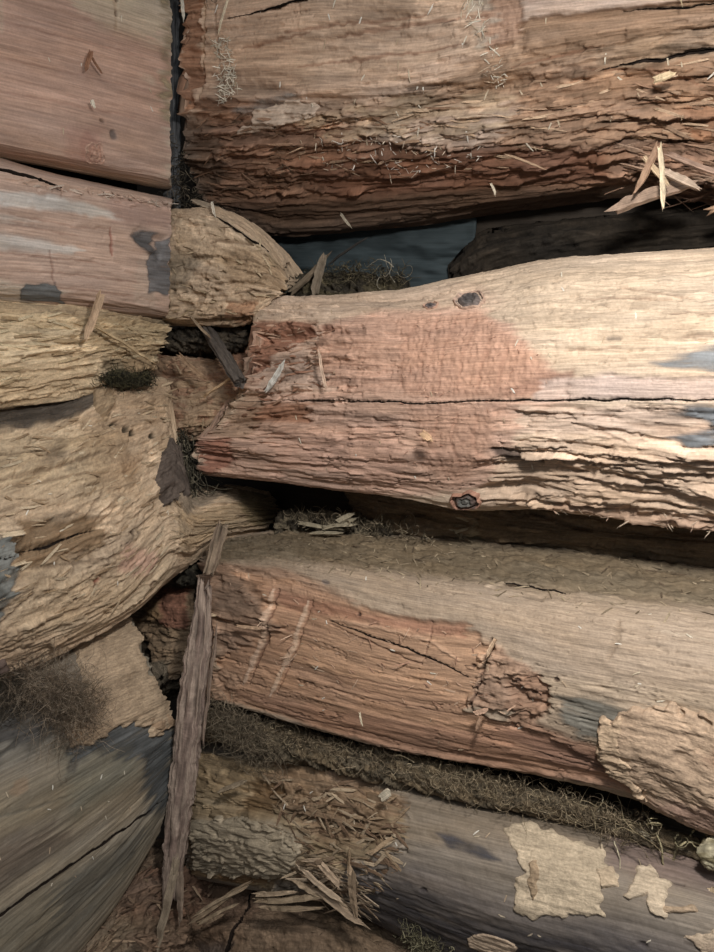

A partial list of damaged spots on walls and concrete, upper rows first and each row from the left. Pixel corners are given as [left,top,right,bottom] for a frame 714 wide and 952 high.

crack [229,0,305,18]
crack [0,168,62,188]
damp [131,231,171,295]
damp [657,349,714,371]
crack [245,396,714,404]
damp [667,406,714,447]
damp [0,516,105,619]
crack [331,620,468,677]
peeling [596,715,648,802]
crack [0,796,168,917]
peeling [503,820,698,921]
peeling [684,929,714,952]